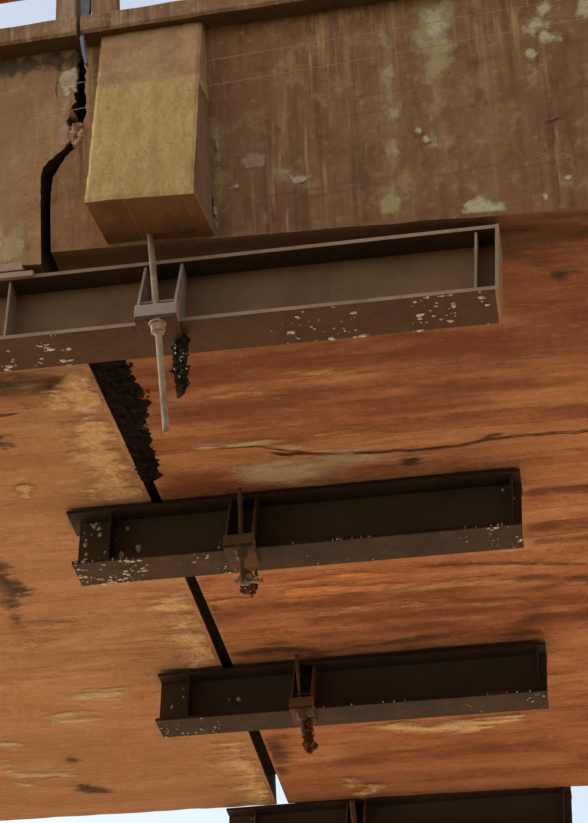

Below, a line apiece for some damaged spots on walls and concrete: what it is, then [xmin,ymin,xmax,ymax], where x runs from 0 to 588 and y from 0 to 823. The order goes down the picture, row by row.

leakage [414,0,454,83]
leakage [523,1,569,43]
leakage [576,0,588,18]
spalling [59,68,77,145]
leakage [463,196,505,213]
spalling [43,374,143,501]
crack [204,431,588,456]
leakage [0,564,29,608]